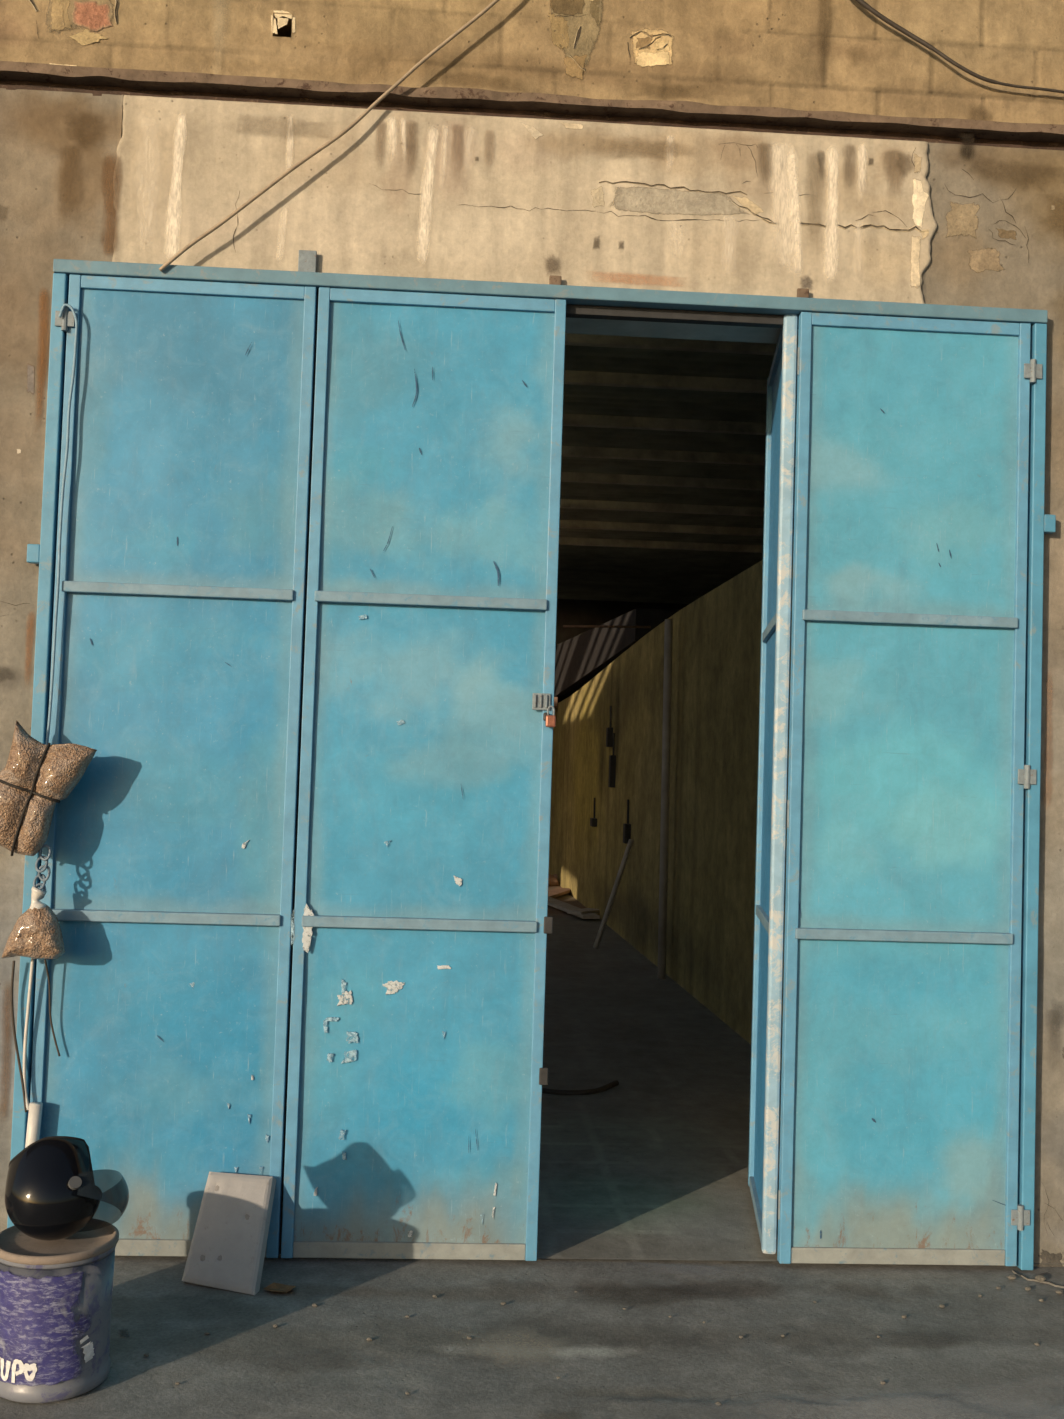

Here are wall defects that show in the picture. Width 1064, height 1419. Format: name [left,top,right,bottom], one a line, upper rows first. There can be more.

crack [29,0,65,38]
flaking render [50,0,114,45]
crack [113,0,121,24]
peeling [550,0,600,25]
spalling [628,28,674,67]
water stain [378,119,437,258]
crack [369,143,938,234]
water stain [763,148,801,267]
water stain [826,145,865,276]
spalling [910,153,929,288]
peeling [945,169,1029,273]